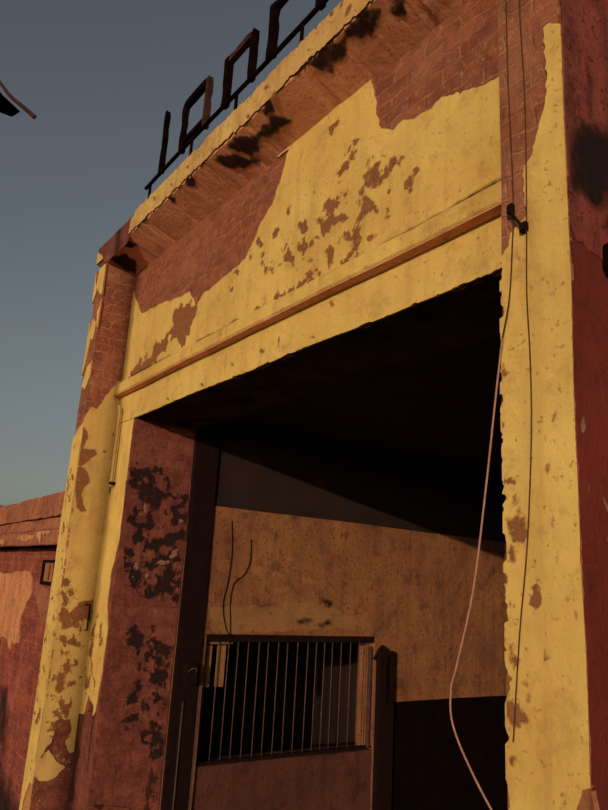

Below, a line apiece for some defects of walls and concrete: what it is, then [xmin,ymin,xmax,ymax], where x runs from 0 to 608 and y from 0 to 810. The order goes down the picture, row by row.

flaking render [373,0,558,256]
peeling [337,138,359,183]
damp [571,124,608,206]
flaking render [65,152,404,512]
flaking render [506,516,527,562]
flaking render [529,584,542,608]
peeling [0,462,189,810]
flaking render [507,701,528,727]
flaking render [578,789,592,810]